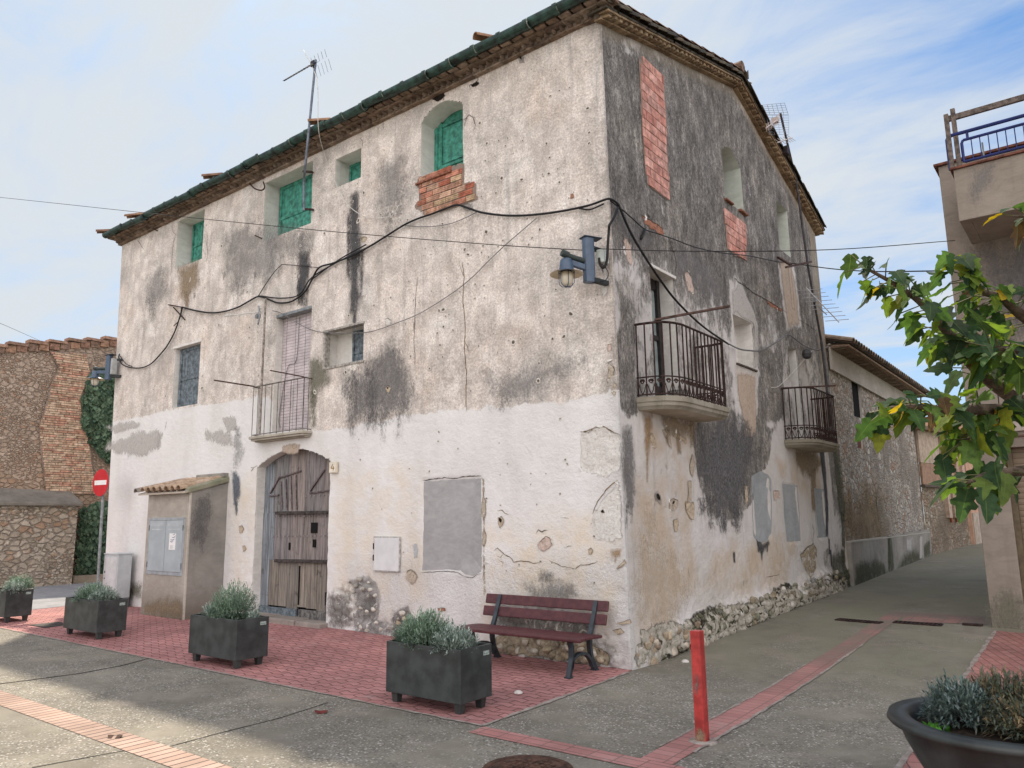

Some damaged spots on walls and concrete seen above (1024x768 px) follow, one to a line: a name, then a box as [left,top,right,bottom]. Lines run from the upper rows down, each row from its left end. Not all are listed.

damp [347,193,363,341]
damp [780,263,799,327]
damp [344,346,413,431]
spalling [564,425,622,555]
damp [663,414,754,531]
crack [495,546,598,569]